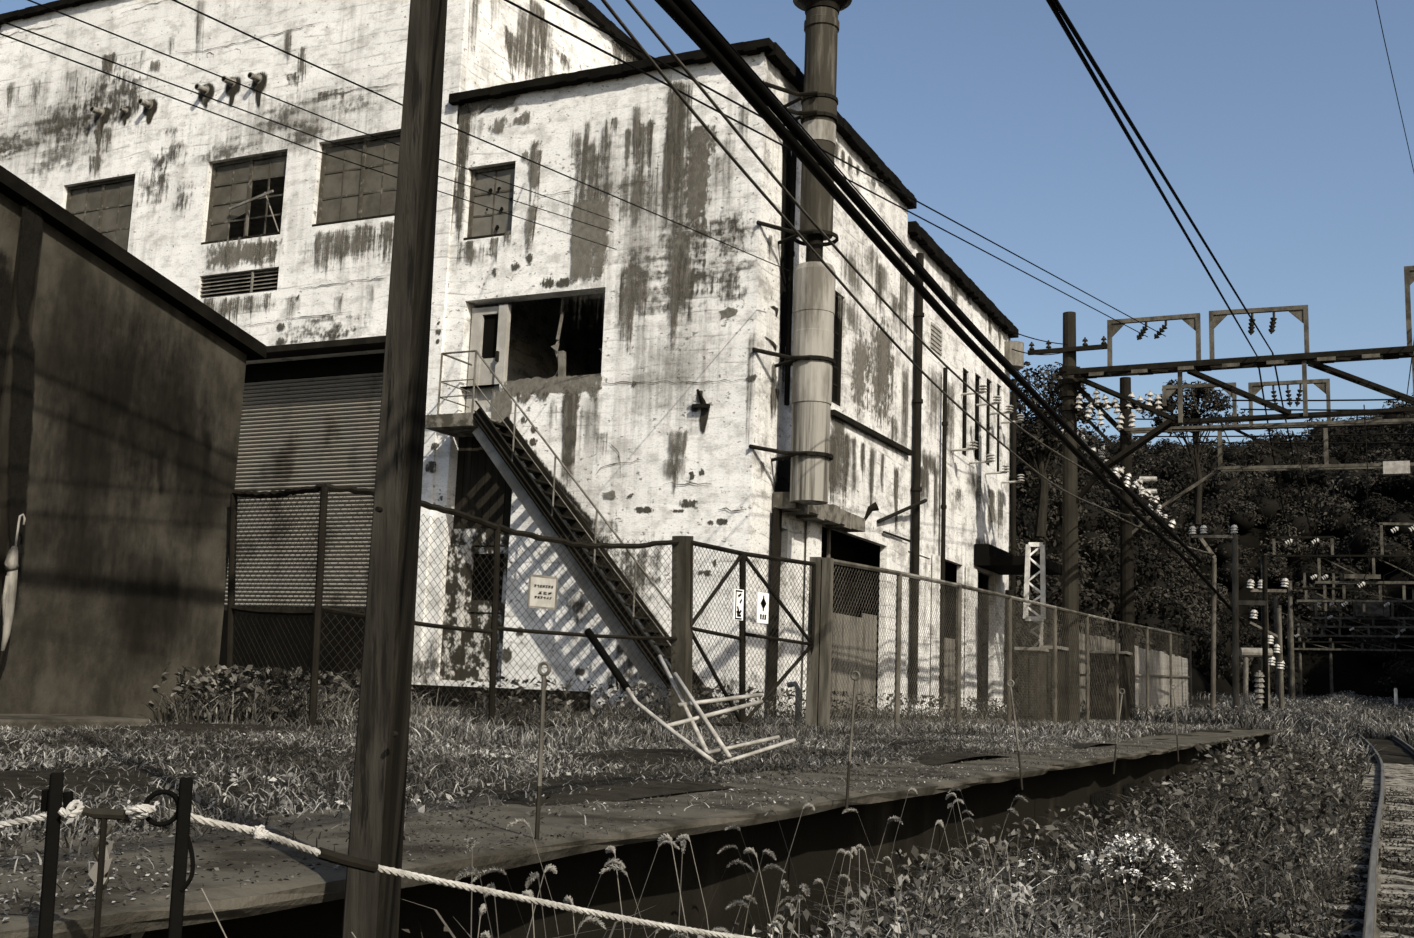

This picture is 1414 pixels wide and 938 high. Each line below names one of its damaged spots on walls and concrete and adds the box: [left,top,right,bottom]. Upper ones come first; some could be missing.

leakage [505,0,570,80]
leakage [0,52,141,174]
leakage [451,102,511,265]
leakage [305,221,394,270]
leakage [572,80,792,419]
leakage [838,240,908,335]
leakage [949,277,971,306]
leakage [521,392,661,598]
leakage [664,430,687,495]
leakage [829,416,898,528]
leakage [891,367,1004,547]
leakage [412,640,445,685]